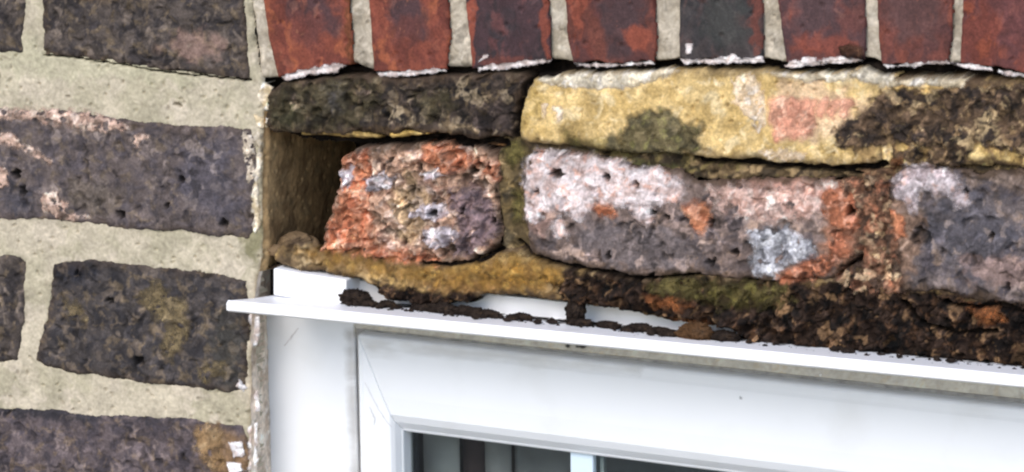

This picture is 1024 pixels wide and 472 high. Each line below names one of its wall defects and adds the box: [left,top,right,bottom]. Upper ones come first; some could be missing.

spalling [376,285,485,304]
spalling [523,149,1024,365]